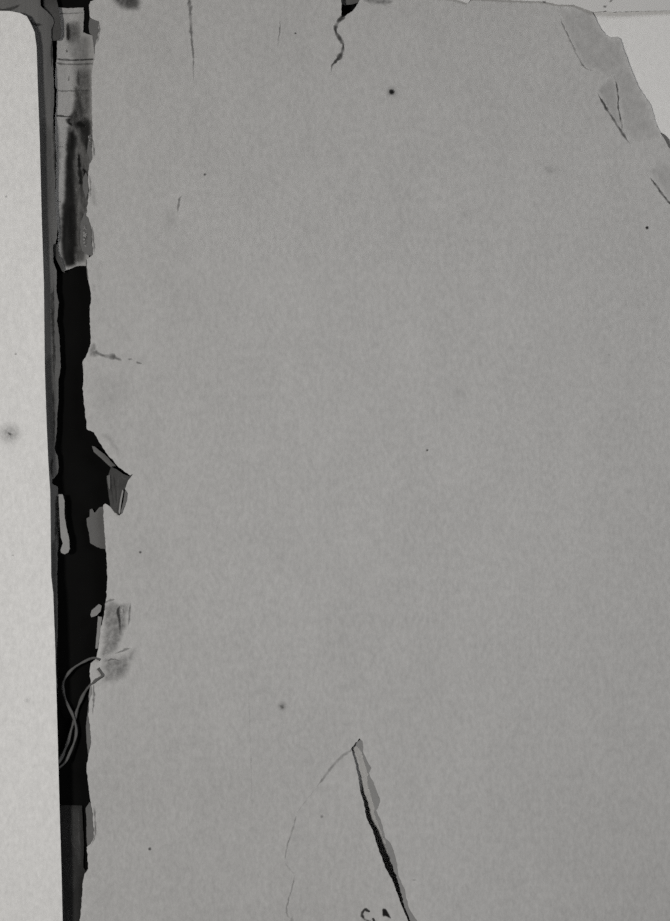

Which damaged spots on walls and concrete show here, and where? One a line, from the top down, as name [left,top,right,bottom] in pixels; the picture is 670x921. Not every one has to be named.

crack [332,16,344,65]